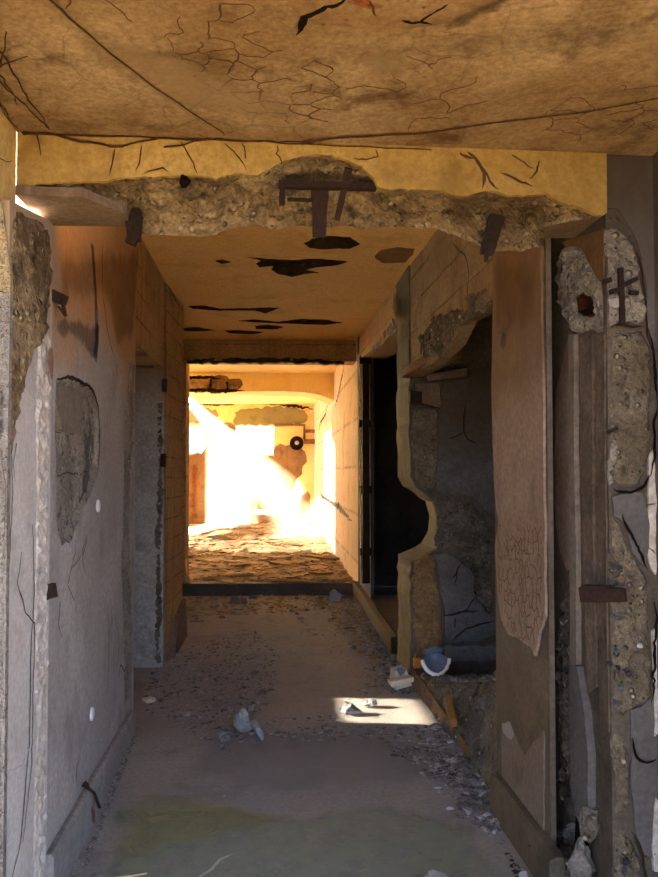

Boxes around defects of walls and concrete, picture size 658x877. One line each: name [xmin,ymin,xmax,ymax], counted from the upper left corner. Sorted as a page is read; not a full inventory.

crack [164,0,486,133]
crack [136,145,167,174]
crack [224,143,246,169]
crack [460,152,540,190]
crack [611,252,658,505]
flaking render [11,212,100,877]
spalling [36,155,658,877]
crack [444,525,543,645]
crack [622,515,656,569]